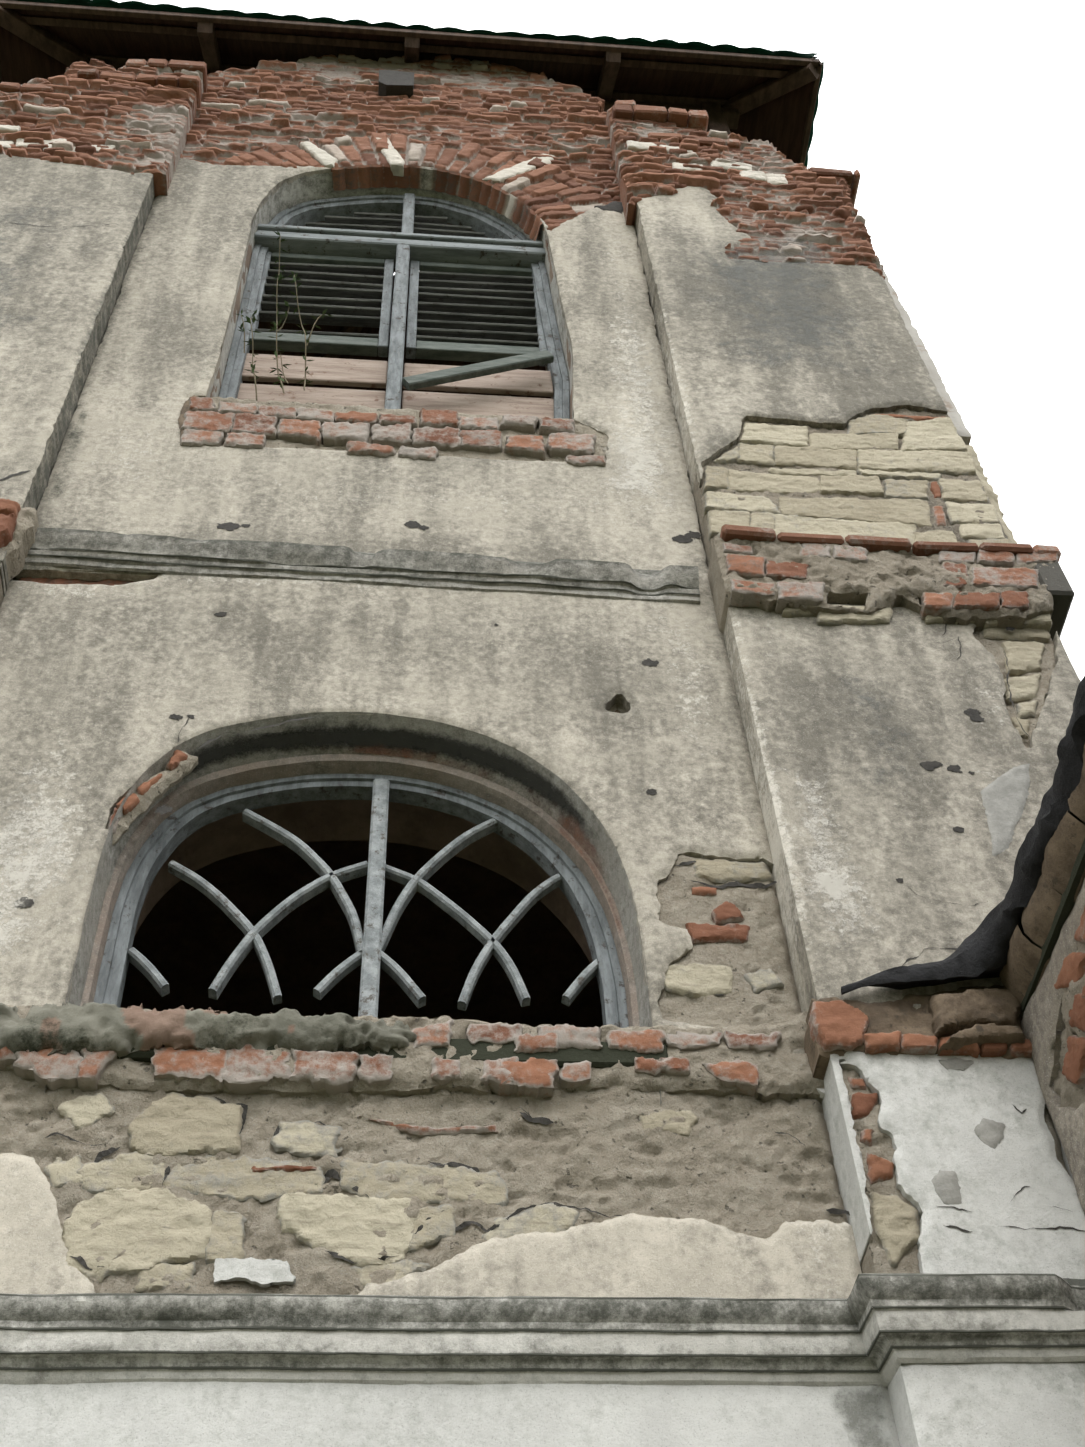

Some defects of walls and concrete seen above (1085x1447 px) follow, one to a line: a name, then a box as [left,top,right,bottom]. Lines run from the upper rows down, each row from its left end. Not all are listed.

flaking render [0,53,885,280]
flaking render [178,395,609,467]
flaking render [0,498,21,548]
flaking render [0,572,134,607]
flaking render [217,522,251,531]
flaking render [672,408,1059,856]
flaking render [657,854,801,1027]
flaking render [1044,907,1085,1176]
flaking render [0,1071,848,1295]
flaking render [842,1069,920,1273]
peeling [931,1170,962,1204]
peeling [974,1118,1006,1149]